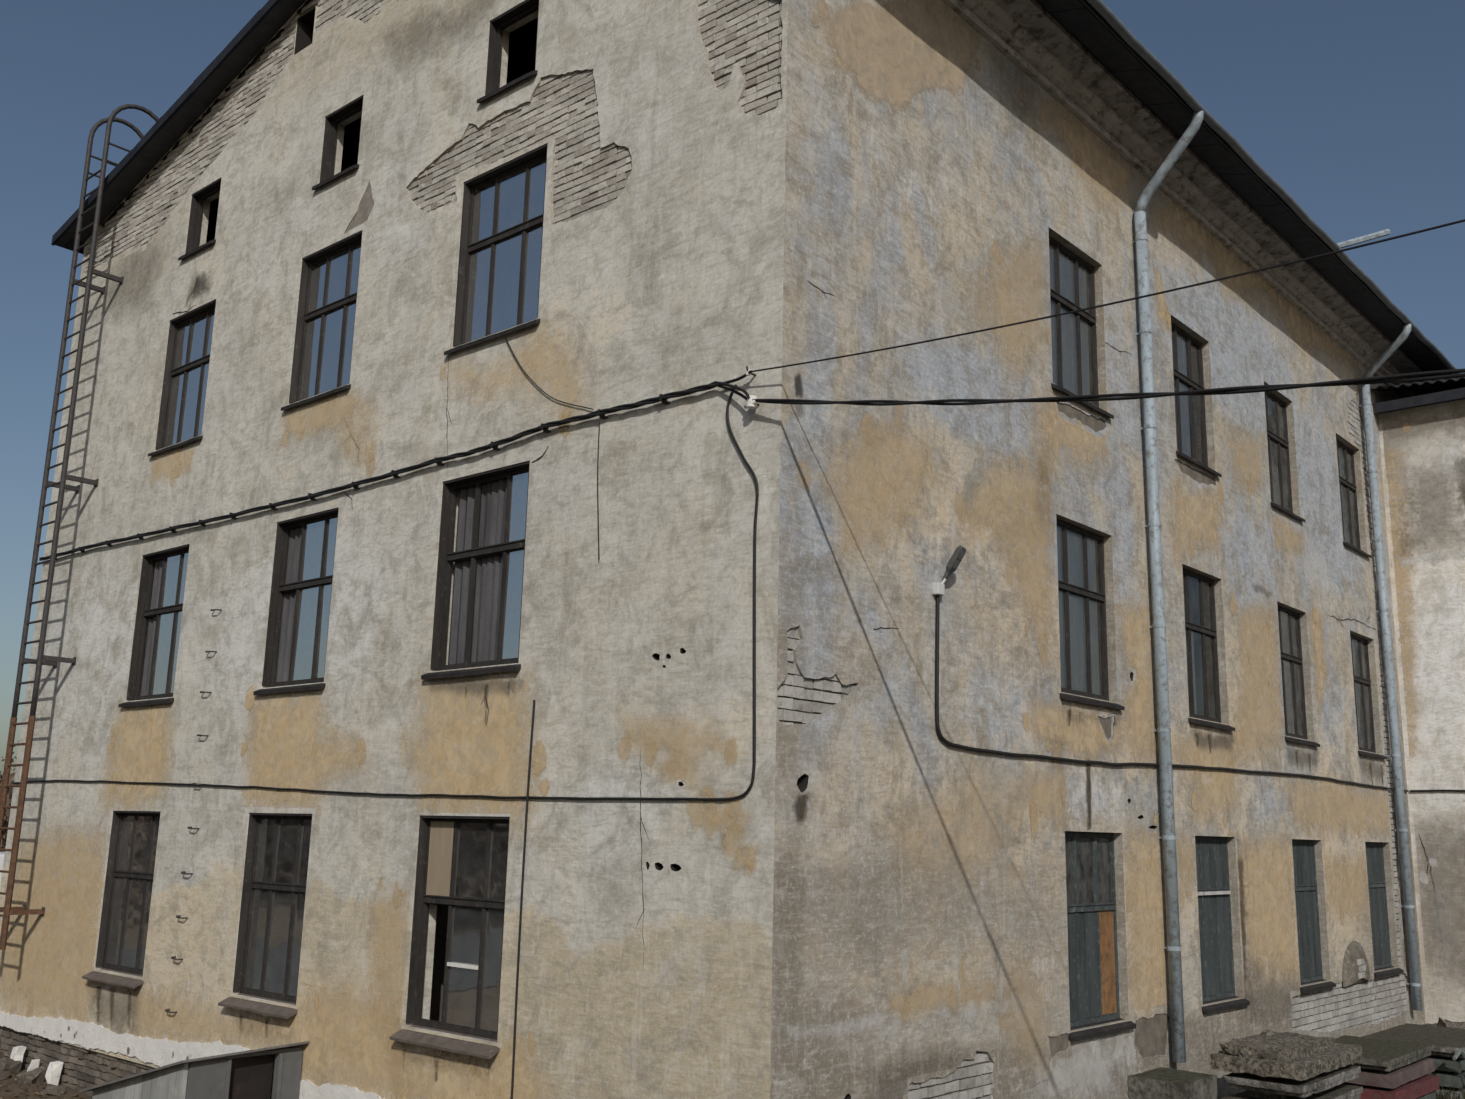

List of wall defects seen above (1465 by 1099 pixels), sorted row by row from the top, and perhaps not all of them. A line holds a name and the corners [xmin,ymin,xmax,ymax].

spalling [696,0,783,116]
spalling [406,69,632,225]
spalling [777,625,859,725]
spalling [1291,392,1465,1032]
peeling [0,834,548,1099]
damp [1399,816,1420,995]
spalling [908,1050,995,1099]